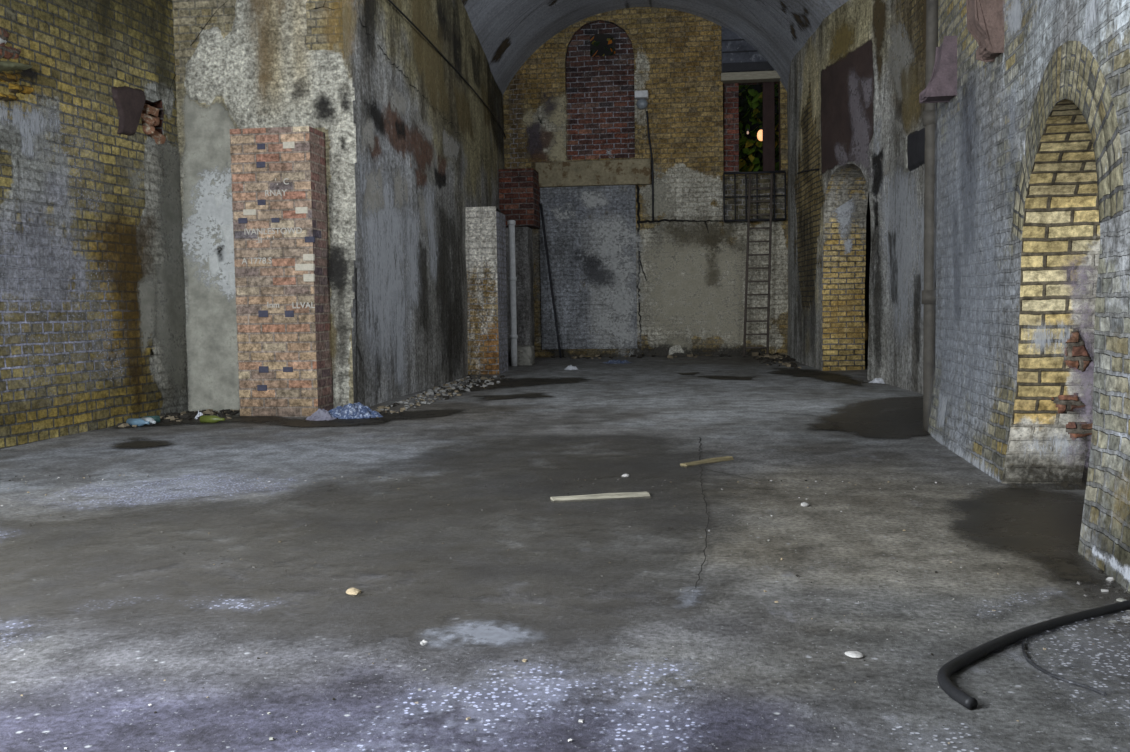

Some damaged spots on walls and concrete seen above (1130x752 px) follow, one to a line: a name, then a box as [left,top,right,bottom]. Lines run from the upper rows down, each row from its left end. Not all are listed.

water stain [0,104,151,404]
peeling [184,0,447,408]
water stain [329,291,346,364]
water stain [359,164,463,384]
water stain [872,170,924,365]
crack [693,437,791,597]
water stain [809,393,1130,726]
water stain [891,723,979,752]